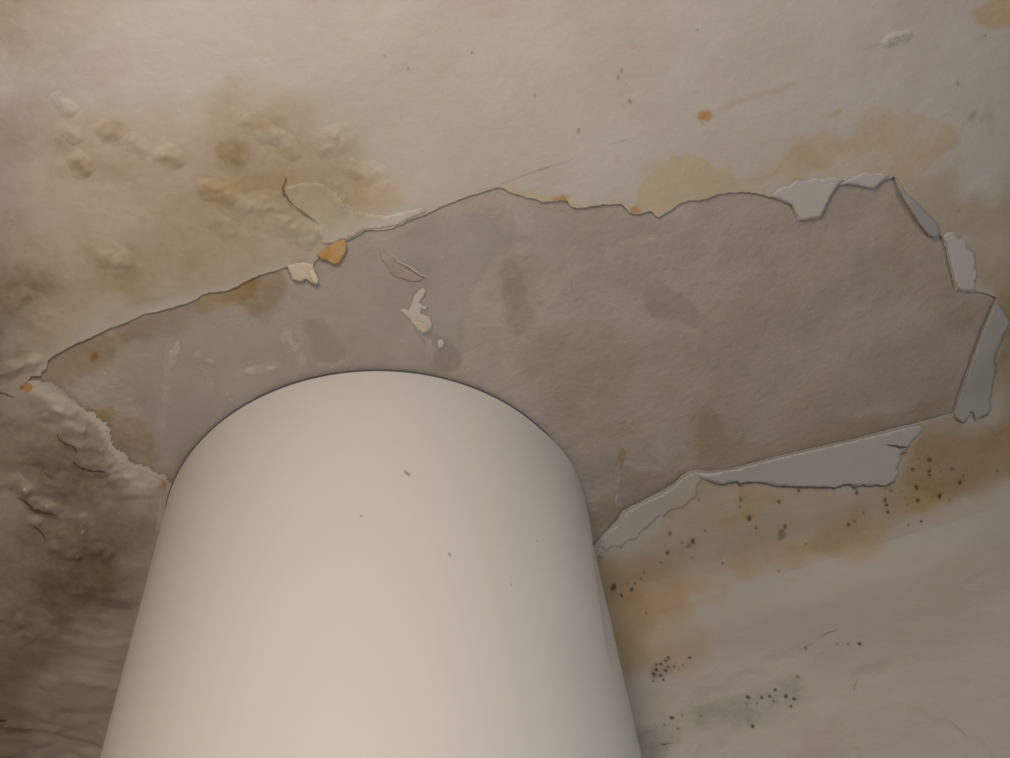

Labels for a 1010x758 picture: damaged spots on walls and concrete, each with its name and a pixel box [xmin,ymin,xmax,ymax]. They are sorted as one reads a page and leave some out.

crack [282,176,313,220]
peeling [23,177,996,546]